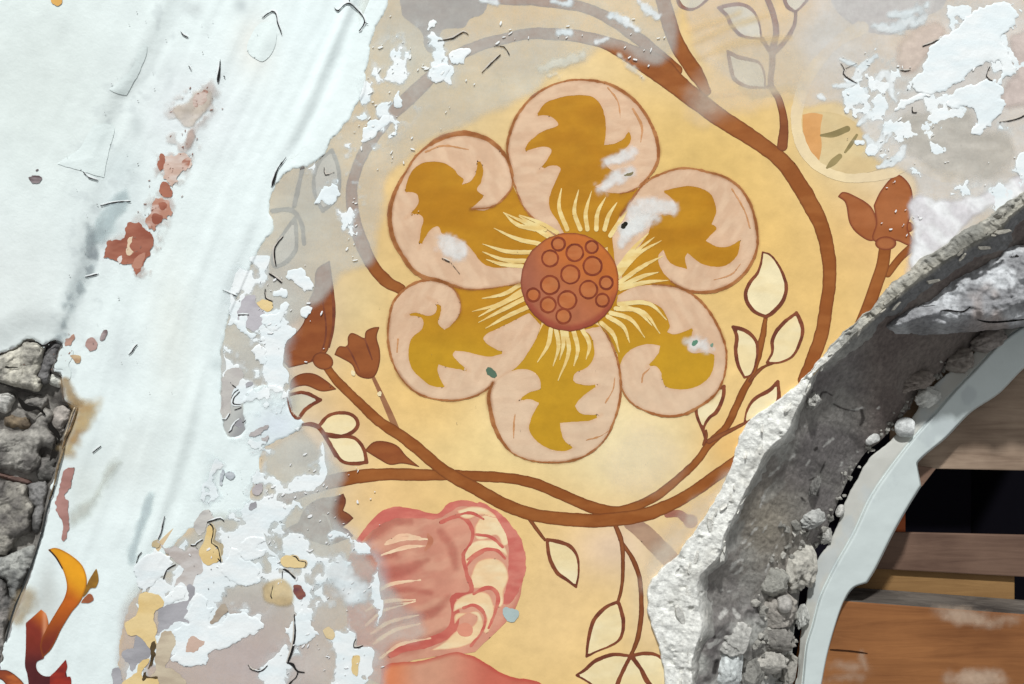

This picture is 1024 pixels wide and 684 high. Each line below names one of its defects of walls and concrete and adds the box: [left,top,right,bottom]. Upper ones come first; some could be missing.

peeling [431,48,471,83]
peeling [361,91,402,142]
peeling [103,90,211,275]
peeling [314,183,340,205]
peeling [234,268,314,365]
spalling [647,1,1024,684]
peeling [220,368,269,442]
spalling [0,330,107,663]
peeling [219,469,235,486]
peeling [249,483,263,510]
peeling [111,510,335,684]
peeling [351,655,360,676]